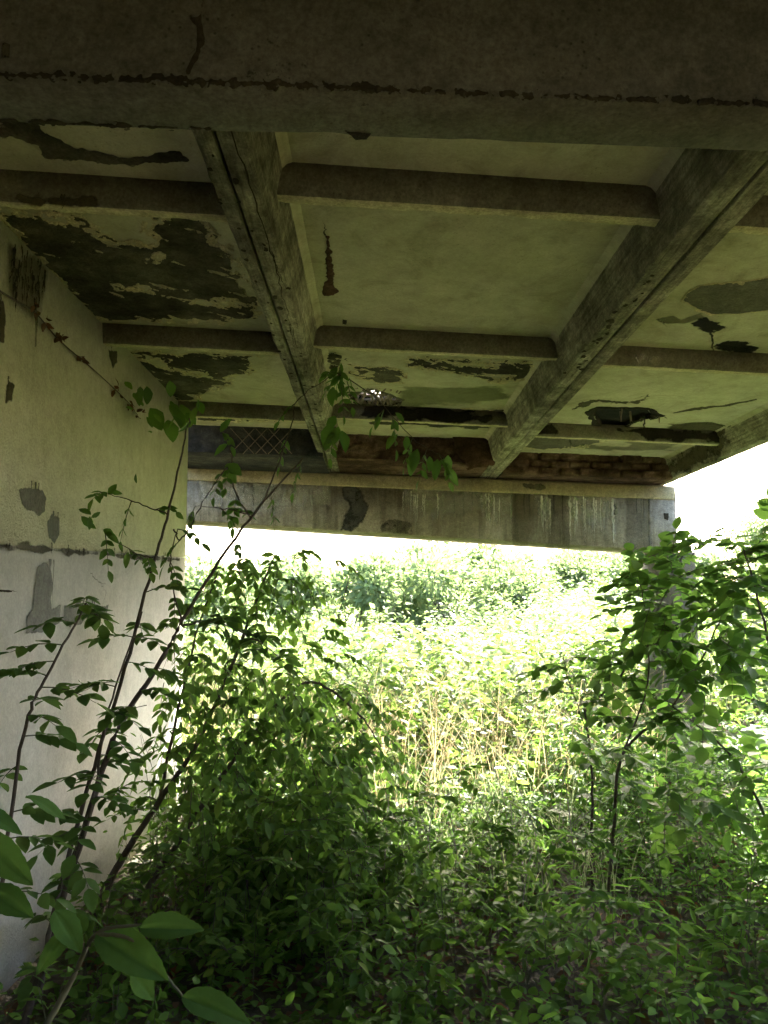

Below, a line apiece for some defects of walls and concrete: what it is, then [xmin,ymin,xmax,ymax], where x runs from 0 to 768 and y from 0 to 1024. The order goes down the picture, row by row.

spalling [0,119,212,167]
crack [231,131,308,376]
corrosion [322,221,339,296]
peeling [0,207,321,426]
peeling [680,277,768,316]
peeling [327,353,535,408]
spalling [585,407,666,428]
leakage [523,483,551,537]
leakage [568,496,615,544]